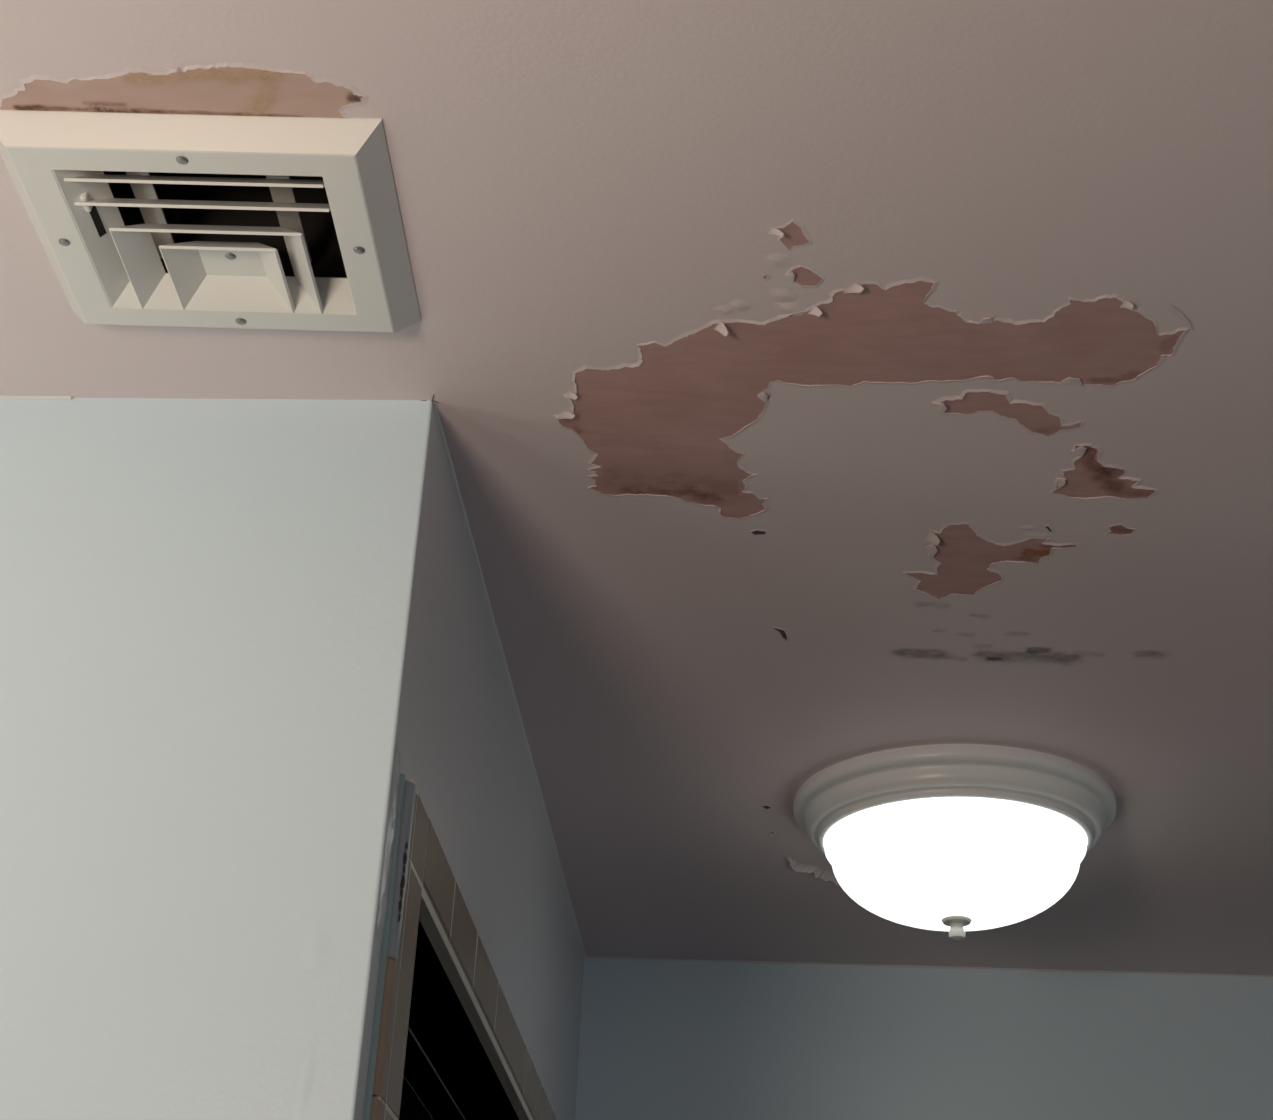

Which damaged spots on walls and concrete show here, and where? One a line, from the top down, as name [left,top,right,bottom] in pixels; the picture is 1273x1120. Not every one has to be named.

peeling [0,61,369,118]
peeling [768,219,813,251]
peeling [552,264,1193,536]
peeling [901,521,1082,600]